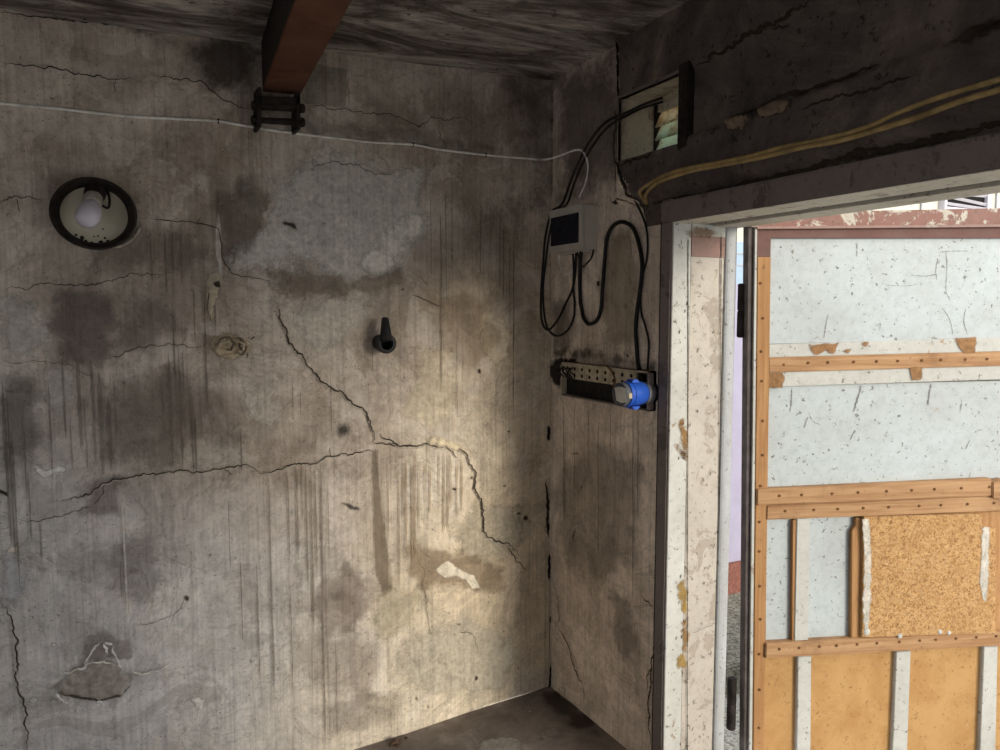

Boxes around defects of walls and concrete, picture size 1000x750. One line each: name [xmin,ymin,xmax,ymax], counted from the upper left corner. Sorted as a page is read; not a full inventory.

crack [698,0,810,65]
crack [951,19,1000,44]
crack [4,63,133,93]
crack [160,76,243,108]
spalling [723,99,790,131]
crack [610,40,1000,218]
leakage [216,142,432,353]
crack [5,218,585,695]
spalling [437,561,480,589]
crack [1,603,30,750]
spalling [55,633,174,706]